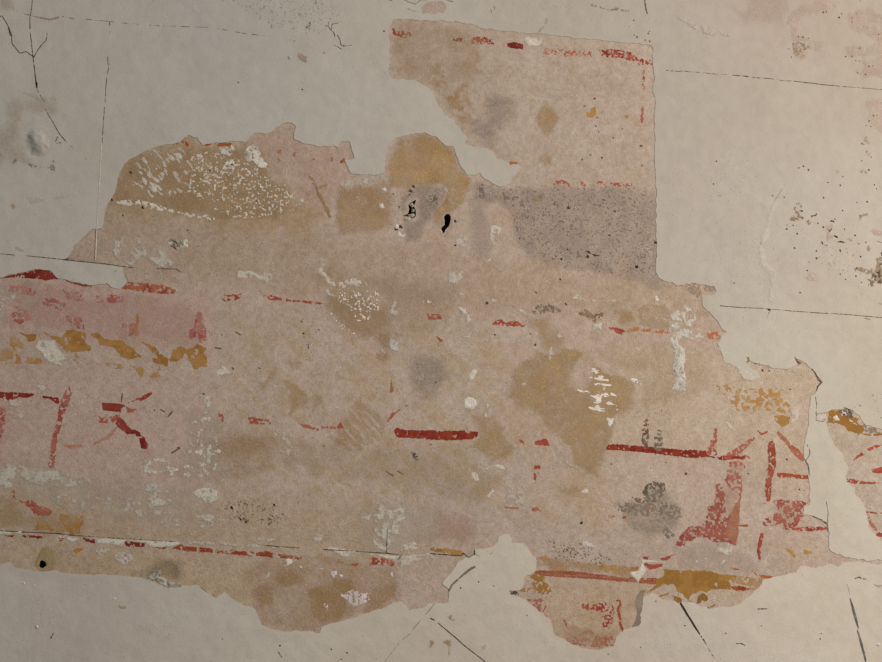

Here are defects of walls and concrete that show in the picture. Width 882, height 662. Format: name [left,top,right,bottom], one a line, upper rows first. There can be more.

crack [0,0,86,159]
peeling [817,407,882,541]
crack [385,550,492,662]
crack [680,603,715,659]
crack [847,584,866,662]